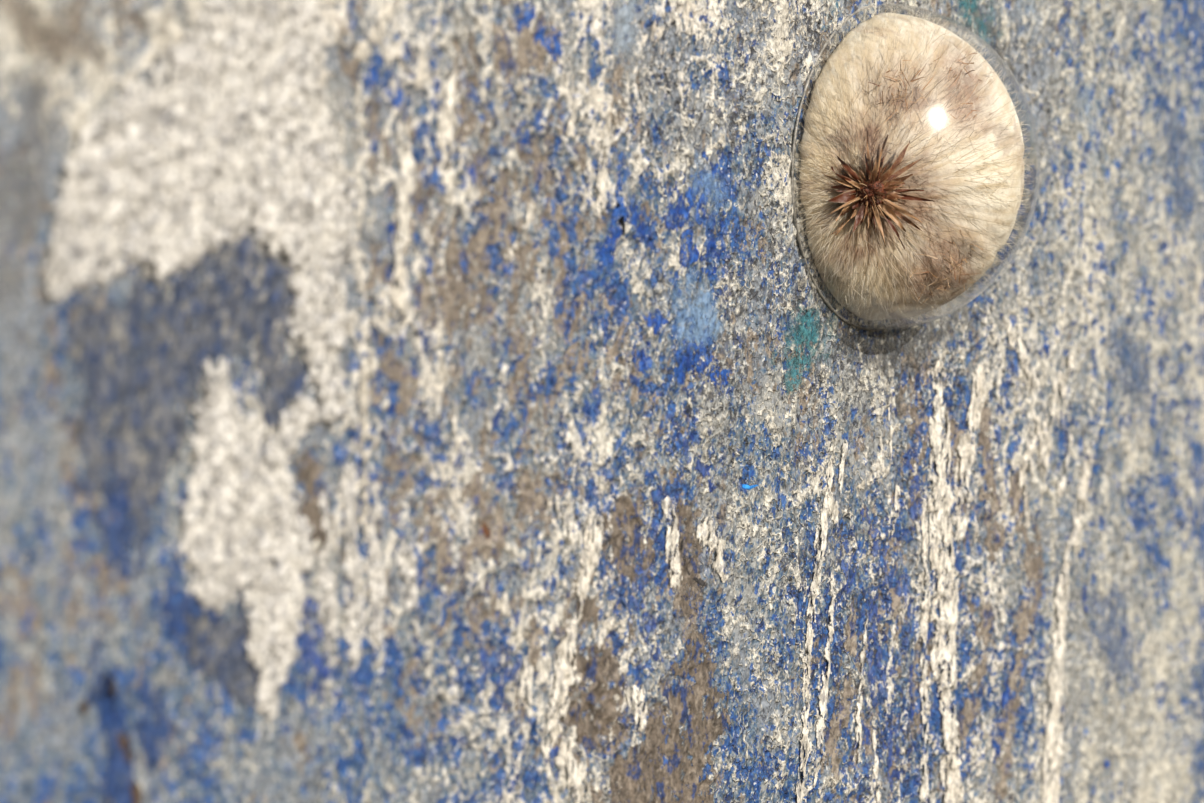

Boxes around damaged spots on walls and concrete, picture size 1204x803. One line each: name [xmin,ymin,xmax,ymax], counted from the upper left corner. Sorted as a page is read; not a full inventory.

spalling [492,0,562,88]
spalling [532,113,587,203]
spalling [609,86,630,167]
peeling [40,0,551,724]
spalling [907,417,923,510]
spalling [508,489,731,803]
spalling [822,600,858,793]
spalling [888,581,907,684]
spalling [957,399,1045,801]